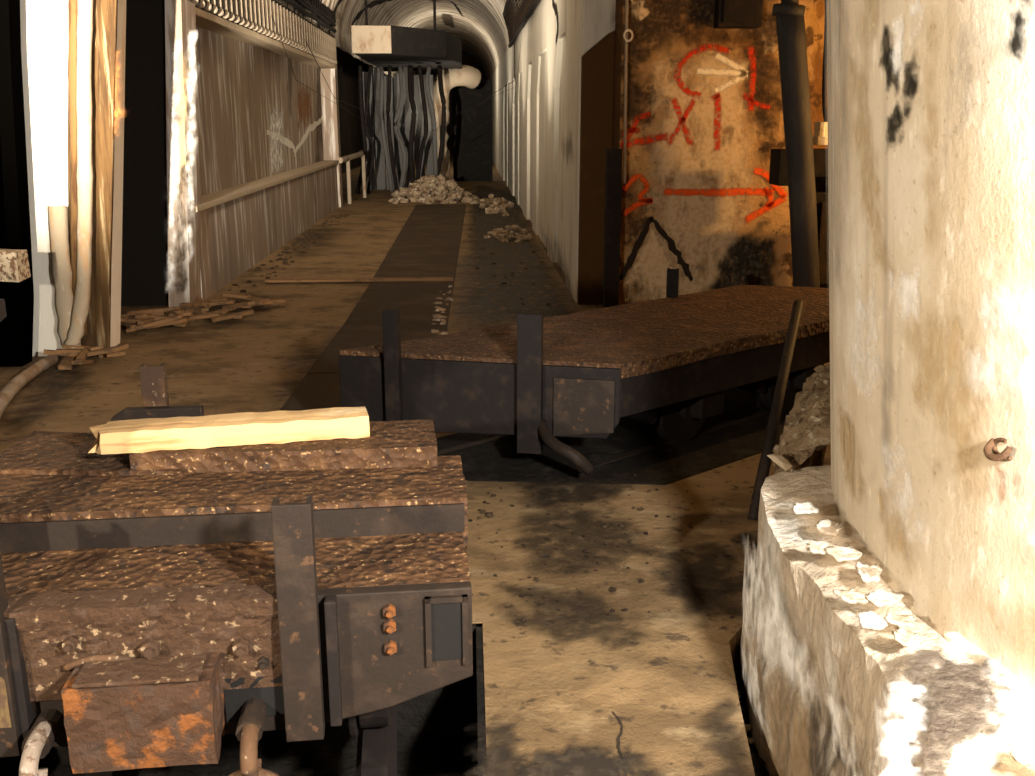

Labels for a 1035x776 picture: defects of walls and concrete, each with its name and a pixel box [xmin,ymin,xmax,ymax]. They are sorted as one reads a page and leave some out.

leakage [711,237,777,290]
crack [611,711,627,776]